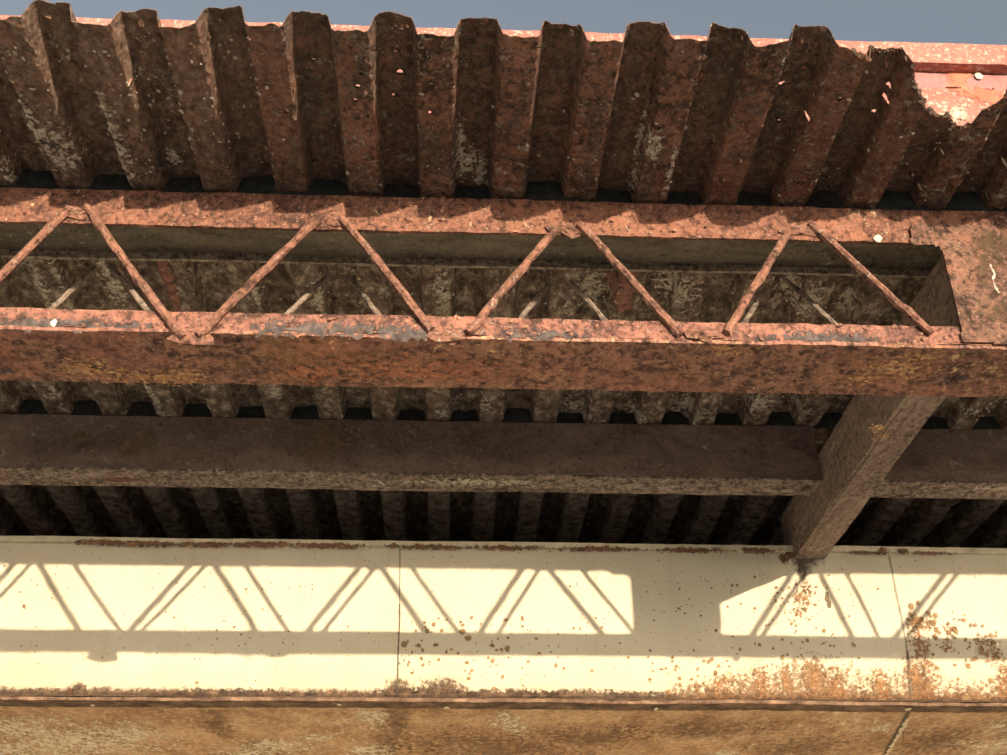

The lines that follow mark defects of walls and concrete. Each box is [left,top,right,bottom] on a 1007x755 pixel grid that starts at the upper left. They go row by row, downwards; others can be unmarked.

peeling [941,72,1004,124]
corrosion [54,355,209,386]
corrosion [256,351,544,388]
corrosion [838,347,970,388]
corrosion [399,616,510,690]
corrosion [647,574,1007,701]